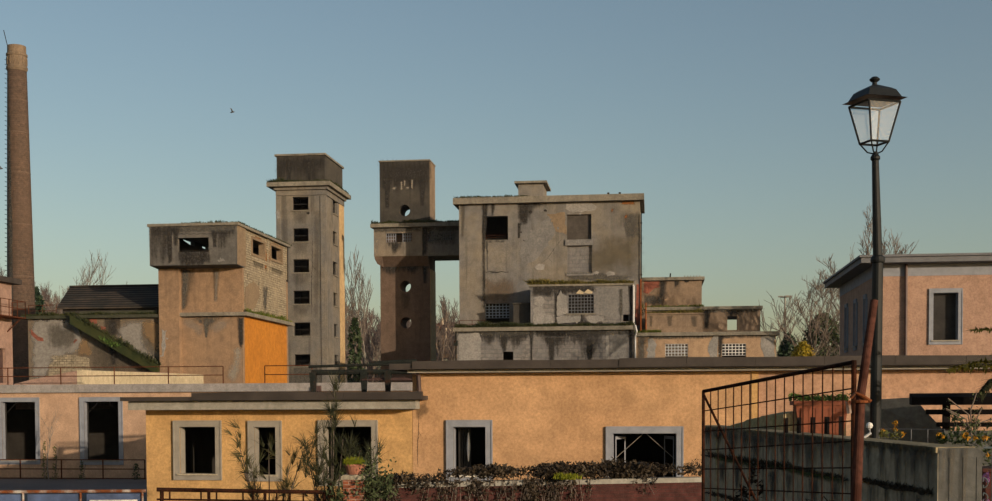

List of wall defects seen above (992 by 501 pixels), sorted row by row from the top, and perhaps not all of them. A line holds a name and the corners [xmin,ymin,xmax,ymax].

damp [518,203,540,238]
damp [151,225,233,309]
peeling [29,319,91,378]
peeling [90,319,168,358]
damp [197,317,215,337]
damp [458,272,766,360]